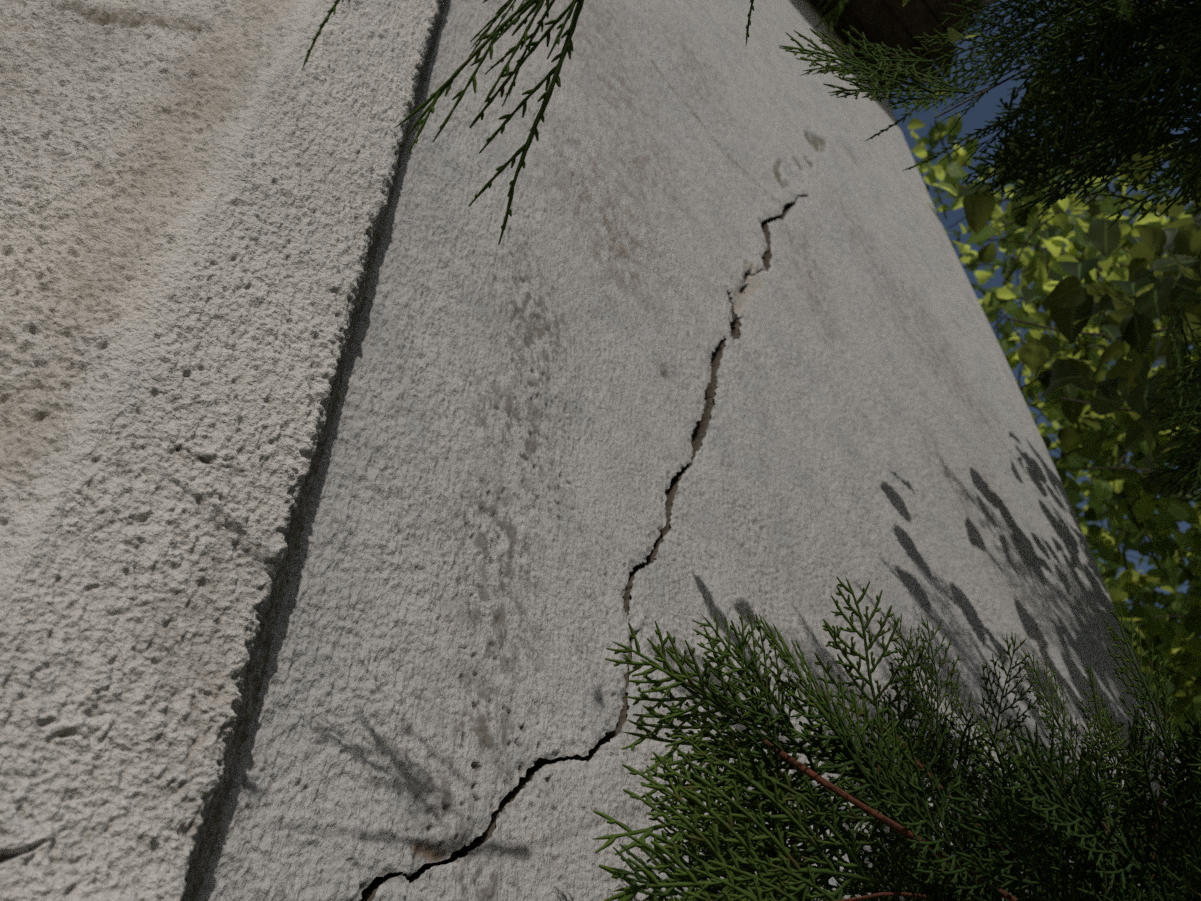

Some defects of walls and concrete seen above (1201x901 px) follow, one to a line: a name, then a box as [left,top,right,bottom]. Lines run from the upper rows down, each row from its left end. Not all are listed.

crack [359,194,805,901]